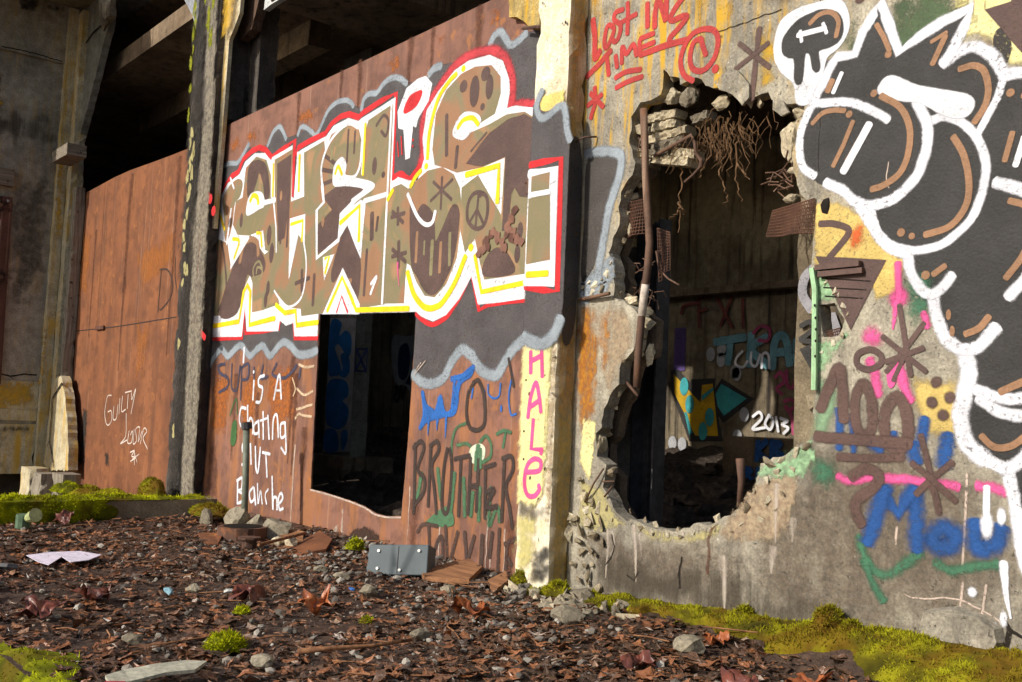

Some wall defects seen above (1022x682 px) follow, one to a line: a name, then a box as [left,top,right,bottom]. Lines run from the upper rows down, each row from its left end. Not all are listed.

peeling [714,69,751,106]
peeling [773,97,791,117]
corrosion [79,409,87,464]
spalling [579,468,622,532]
spalling [638,441,815,542]